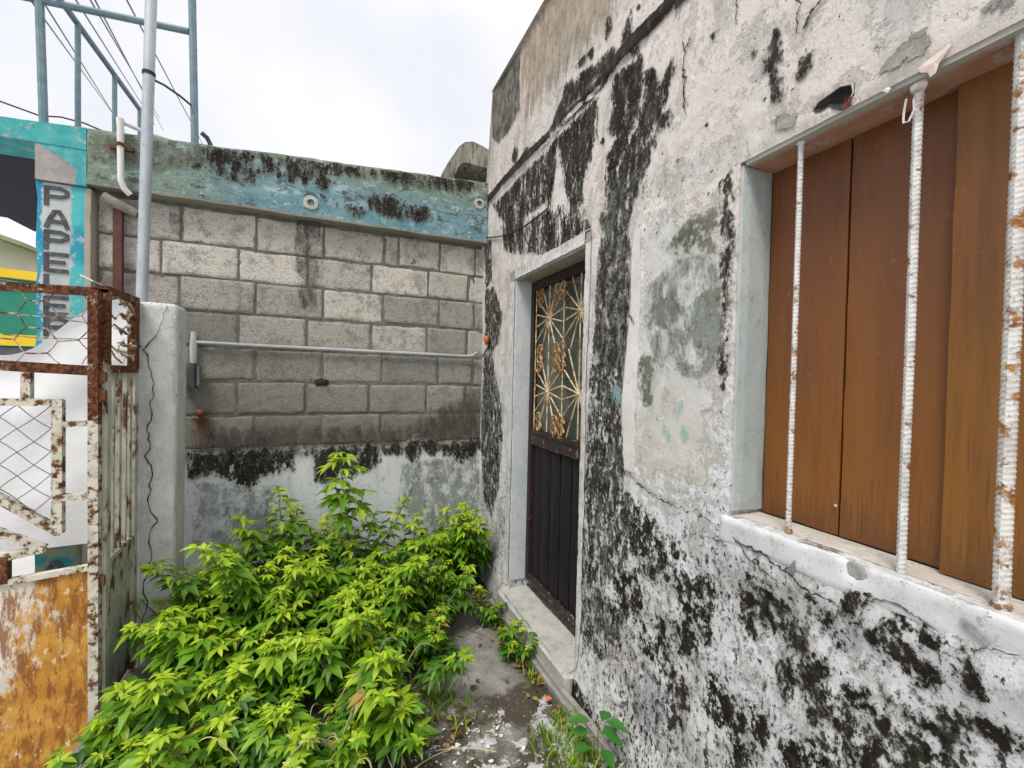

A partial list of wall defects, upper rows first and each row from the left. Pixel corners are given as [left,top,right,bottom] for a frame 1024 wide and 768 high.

spalling [811,82,854,112]
peeling [879,27,952,77]
damp [192,146,487,222]
damp [492,0,1024,768]
crack [139,305,168,621]
damp [187,390,481,546]
crack [632,477,942,634]
crack [970,647,1021,656]